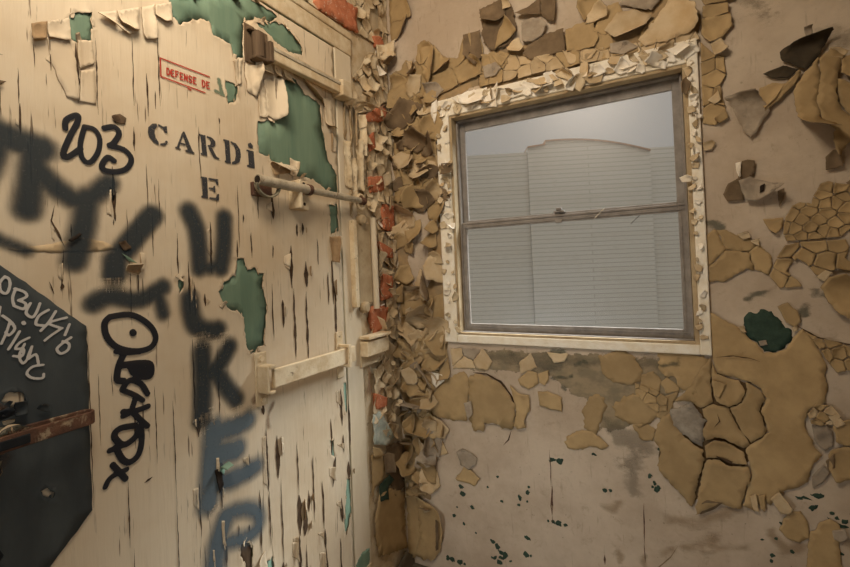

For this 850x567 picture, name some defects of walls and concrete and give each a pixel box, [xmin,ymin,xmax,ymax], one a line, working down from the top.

peeling [31,8,96,104]
peeling [98,0,338,192]
peeling [89,239,145,274]
peeling [219,258,268,354]
peeling [306,0,850,567]
peeling [0,392,52,437]
peeling [215,462,234,493]
peeling [239,537,273,567]